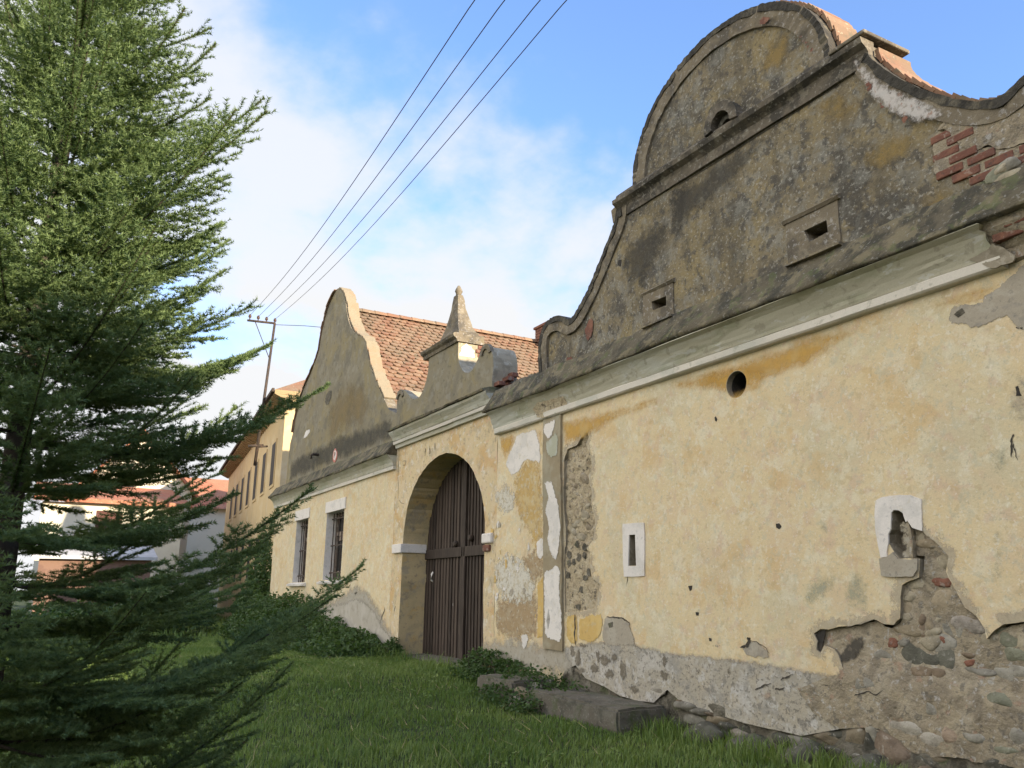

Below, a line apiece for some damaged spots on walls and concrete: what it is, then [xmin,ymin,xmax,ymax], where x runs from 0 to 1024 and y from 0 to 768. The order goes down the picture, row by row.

flaking render [854,61,1024,186]
peeling [949,265,1024,330]
flaking render [488,420,634,649]
flaking render [565,522,1024,768]